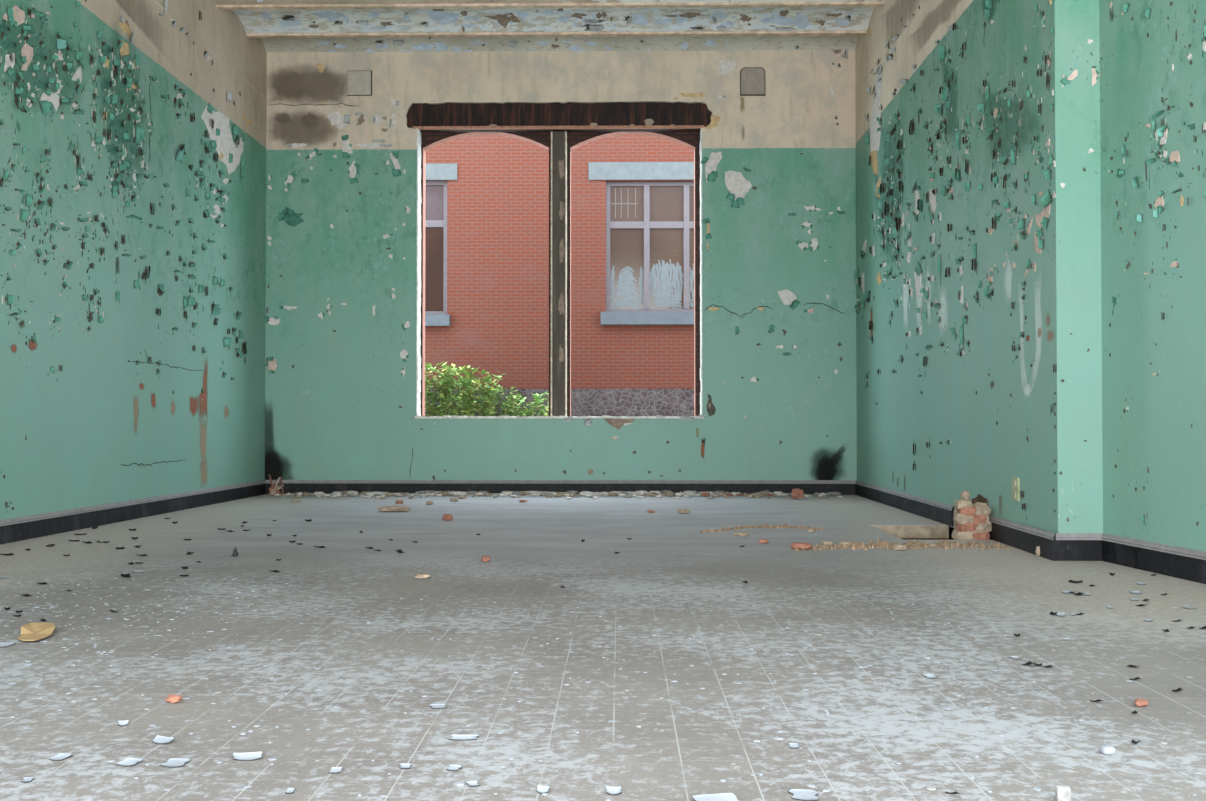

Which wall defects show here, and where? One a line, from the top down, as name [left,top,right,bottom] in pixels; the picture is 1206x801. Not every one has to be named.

peeling [257,0,852,74]
leakage [279,73,338,100]
leakage [276,115,326,141]
peeling [701,152,757,208]
peeling [854,0,1100,394]
peeling [1108,85,1206,279]
crack [704,304,773,320]
peeling [778,289,814,313]
rust [134,383,156,431]
rust [190,364,207,484]
leakage [265,413,288,480]
leakage [816,450,843,480]